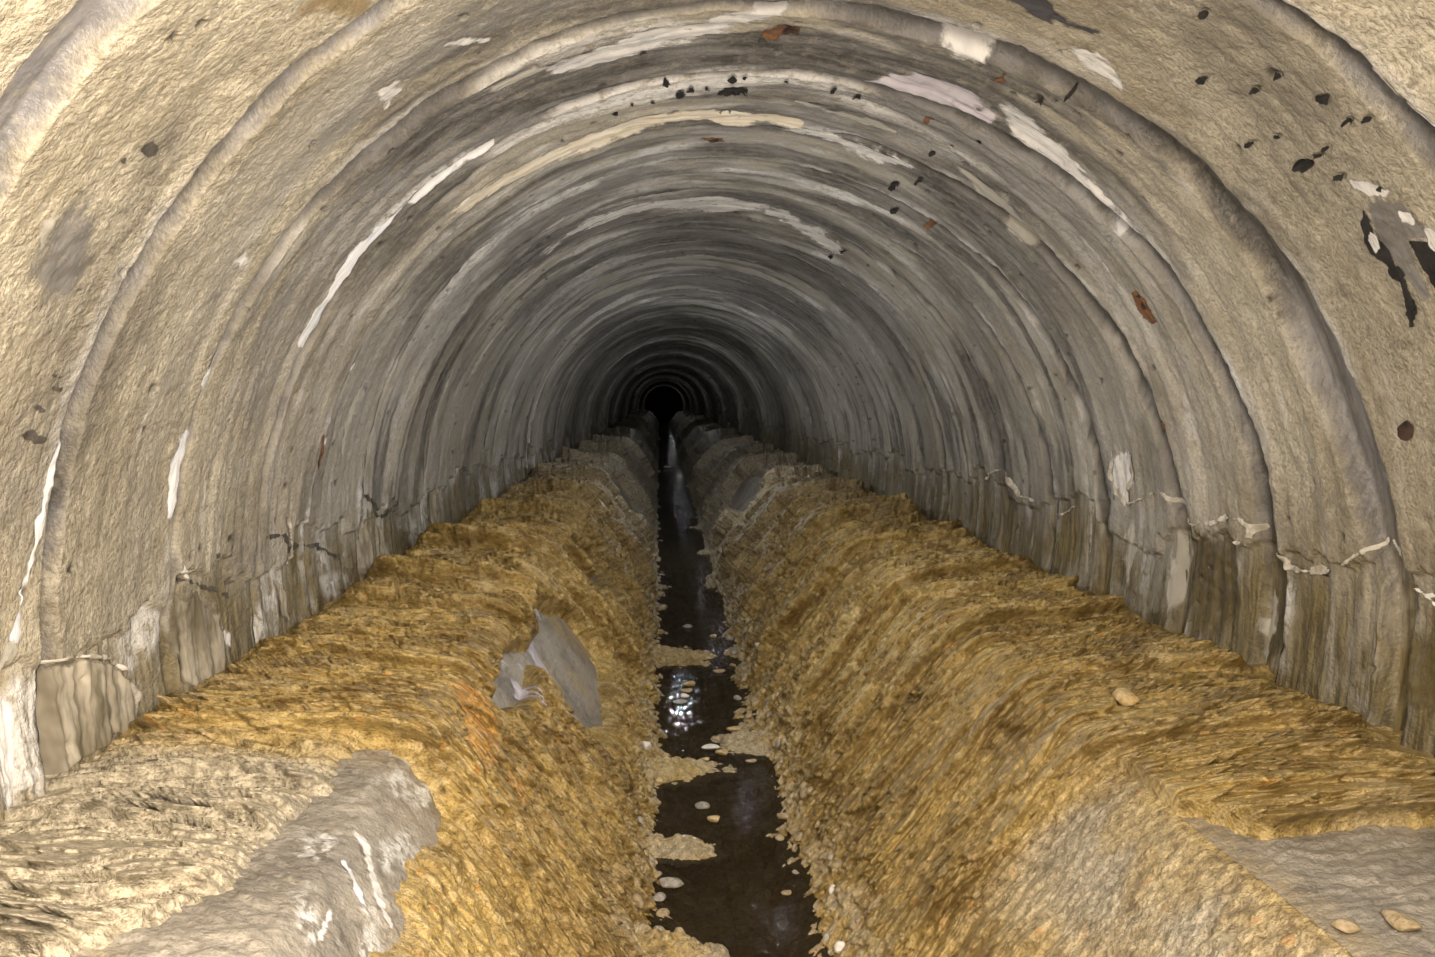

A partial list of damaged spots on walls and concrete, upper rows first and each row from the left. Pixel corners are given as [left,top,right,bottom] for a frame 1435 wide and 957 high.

leakage [444,37,490,47]
leakage [377,80,402,110]
spalling [1315,94,1329,105]
spalling [1341,116,1372,127]
spalling [1291,146,1329,173]
leakage [233,251,249,270]
leakage [297,139,495,348]
peeling [1333,174,1435,327]
leakage [198,351,218,400]
leakage [324,382,364,455]
crack [1393,539,1435,606]
leakage [0,410,1435,957]